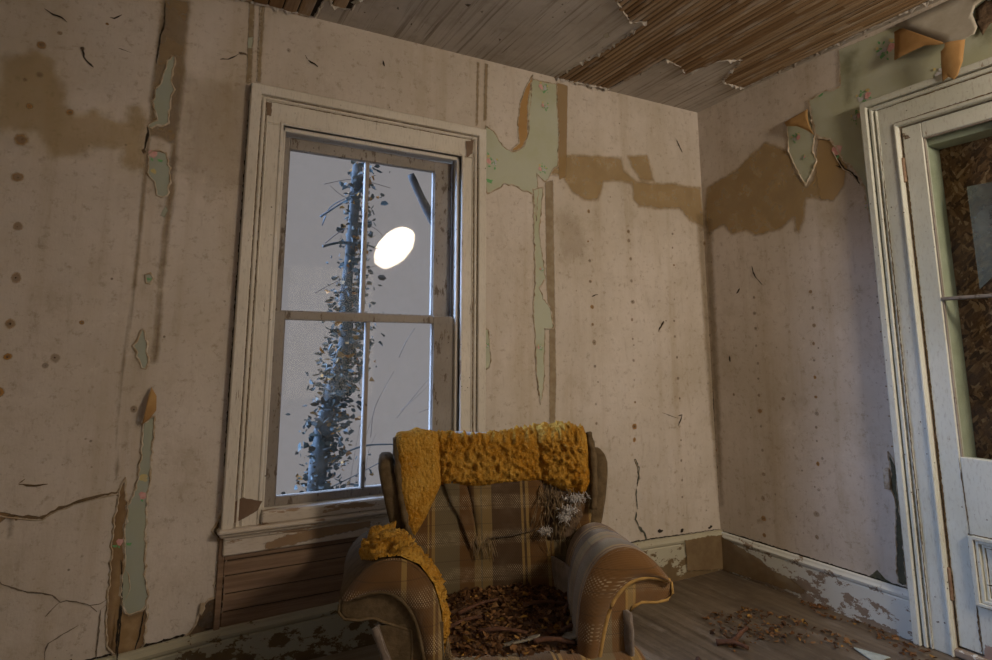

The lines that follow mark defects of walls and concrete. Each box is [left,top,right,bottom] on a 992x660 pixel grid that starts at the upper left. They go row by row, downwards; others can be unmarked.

crack [19,479,47,487]
crack [0,484,124,522]
spalling [211,512,221,546]
peeling [104,477,149,655]
spalling [183,560,227,637]